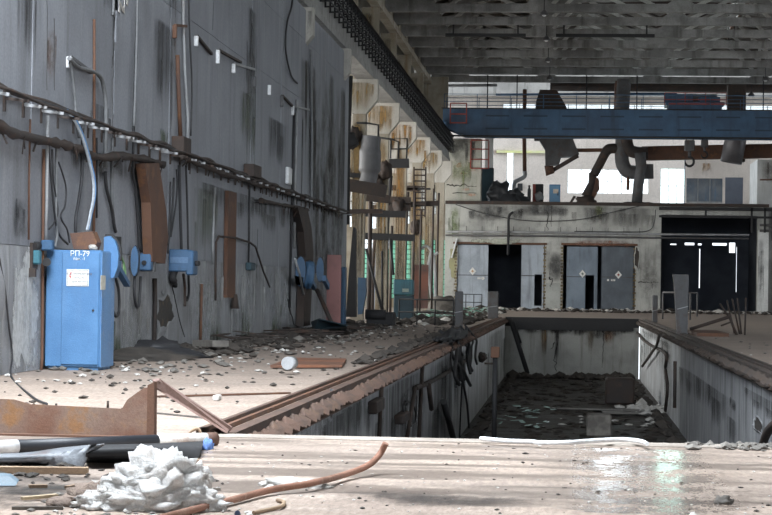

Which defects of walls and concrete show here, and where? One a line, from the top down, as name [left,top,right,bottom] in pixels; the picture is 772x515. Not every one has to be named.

leakage [158,0,174,95]
rust [368,106,391,126]
rust [351,142,360,180]
rust [392,125,434,169]
spalling [157,289,176,333]